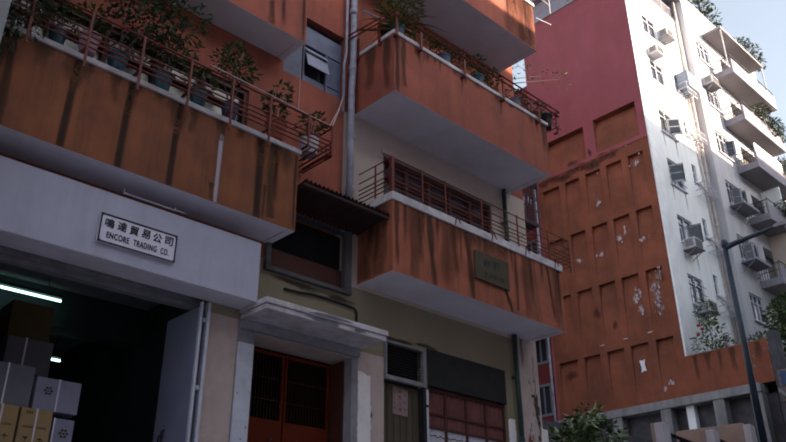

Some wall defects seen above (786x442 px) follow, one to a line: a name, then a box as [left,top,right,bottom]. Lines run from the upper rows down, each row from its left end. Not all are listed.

water stain [0,27,17,112]
water stain [56,54,90,147]
water stain [114,81,140,167]
water stain [165,100,198,186]
water stain [210,119,226,202]
water stain [253,137,297,224]
water stain [384,36,405,89]
water stain [418,212,439,272]
water stain [452,225,519,312]
peeling [633,266,664,315]
spalling [529,374,542,442]